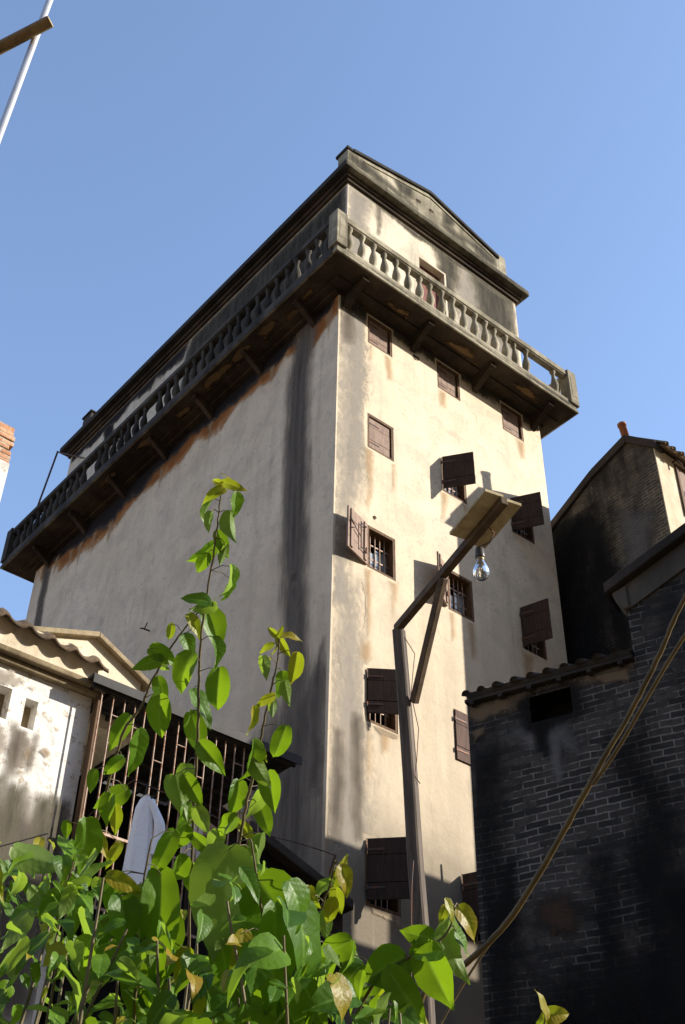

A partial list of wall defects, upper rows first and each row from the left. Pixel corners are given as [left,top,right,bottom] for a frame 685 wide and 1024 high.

rust [311,295,339,347]
rust [40,332,300,580]
water stain [262,323,369,873]
water stain [0,724,70,861]
water stain [0,872,57,1021]